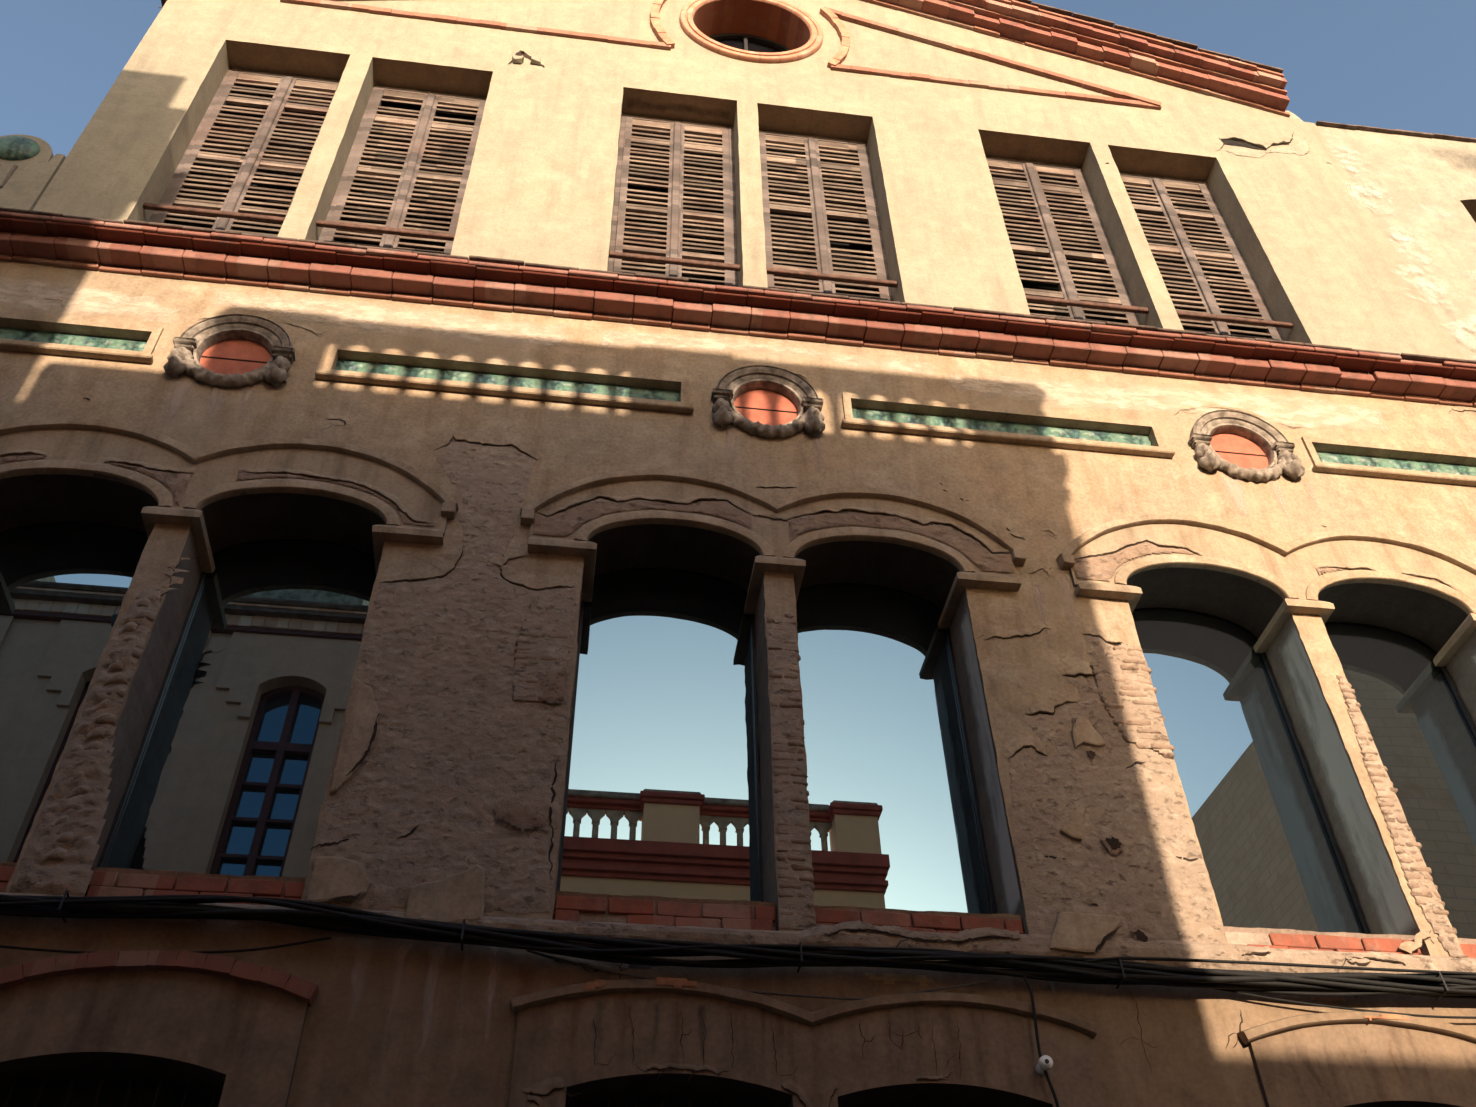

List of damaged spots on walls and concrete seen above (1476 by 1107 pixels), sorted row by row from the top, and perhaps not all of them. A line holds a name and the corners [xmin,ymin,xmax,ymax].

crack [1215,132,1331,164]
flaking render [236,466,438,526]
crack [753,481,797,521]
flaking render [9,587,163,896]
flaking render [305,426,753,923]
flaking render [1000,620,1228,954]
flaking render [1336,675,1468,958]